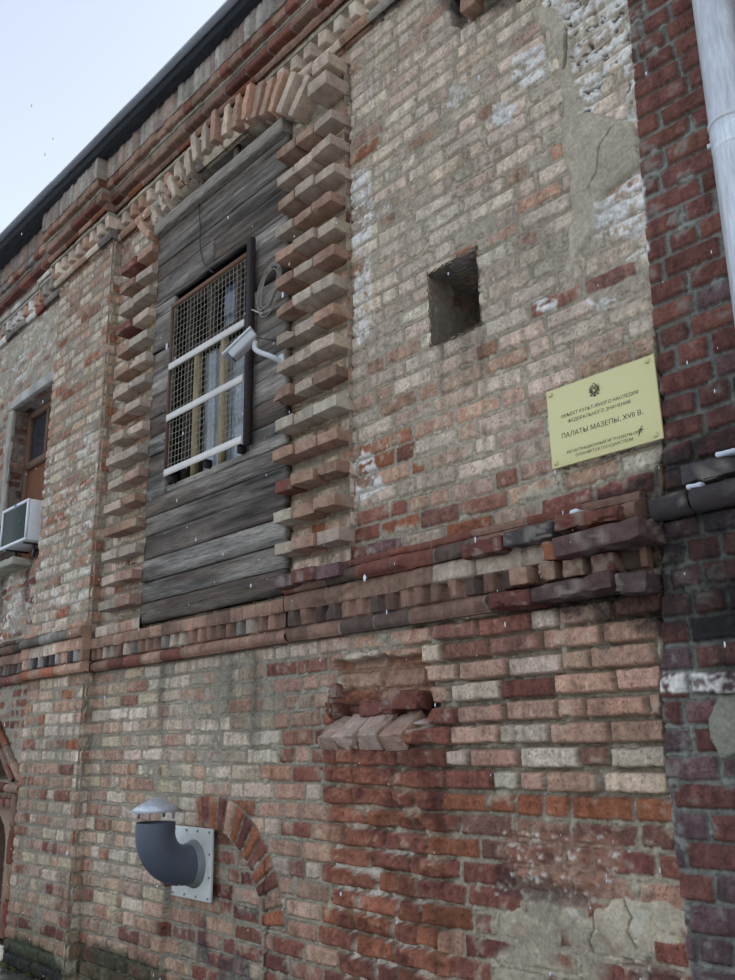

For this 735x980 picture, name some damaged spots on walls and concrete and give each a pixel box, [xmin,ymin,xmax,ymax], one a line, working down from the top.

crack [586,124,614,190]
peeling [593,172,649,258]
spalling [495,827,625,909]
water stain [2,948,63,980]
crack [588,909,596,954]
crack [622,895,639,950]